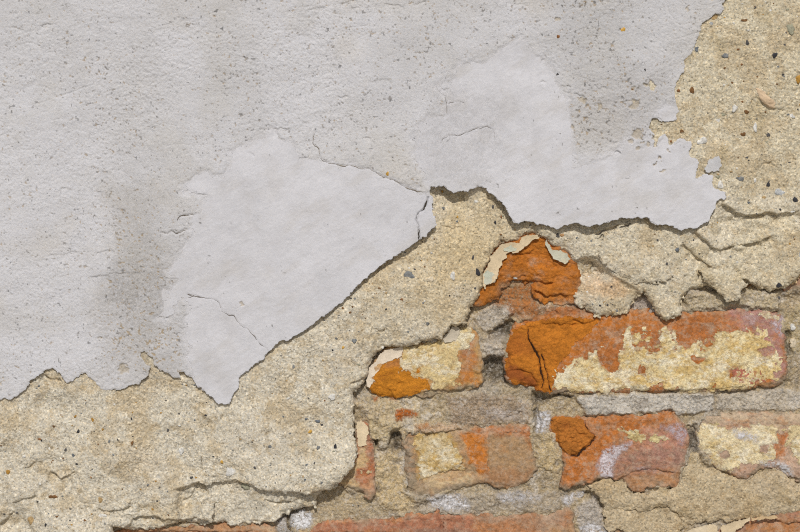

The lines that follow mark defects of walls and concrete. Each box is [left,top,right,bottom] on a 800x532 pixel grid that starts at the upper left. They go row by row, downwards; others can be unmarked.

crack [313,136,427,240]
peeling [157,128,436,404]
peeling [483,235,539,289]
peeling [545,240,571,264]
spalling [599,224,674,284]
spalling [698,267,748,302]
peeling [369,326,475,399]
crack [527,329,551,391]
peeling [505,316,784,394]
spalling [550,416,595,455]
spalling [588,421,800,532]
spalling [197,502,215,523]